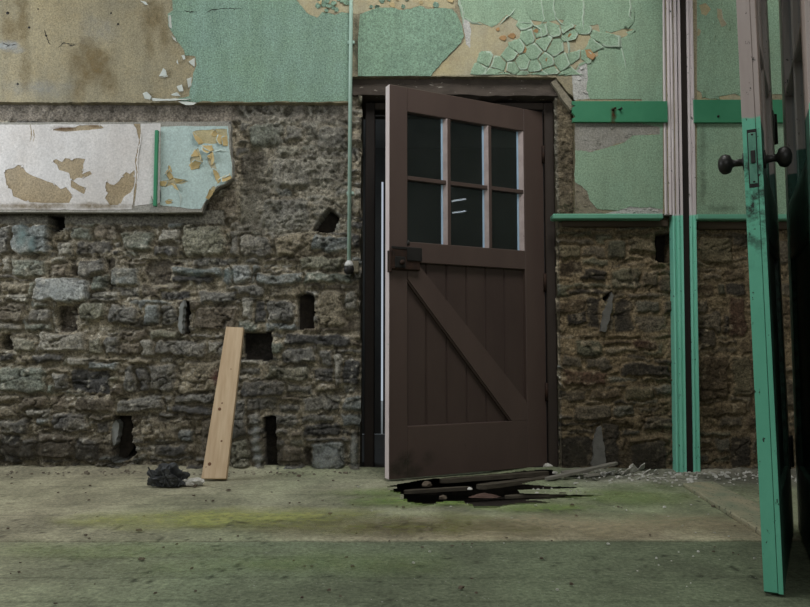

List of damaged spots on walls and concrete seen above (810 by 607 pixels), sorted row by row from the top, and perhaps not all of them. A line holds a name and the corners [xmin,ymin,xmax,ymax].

peeling [431,10,636,100]
peeling [52,123,103,132]
flaking render [574,123,660,152]
peeling [3,158,92,203]
peeling [105,171,136,205]
flaking render [132,198,180,212]
peeling [160,164,188,191]
peeling [189,129,232,200]
flaking render [574,182,663,214]